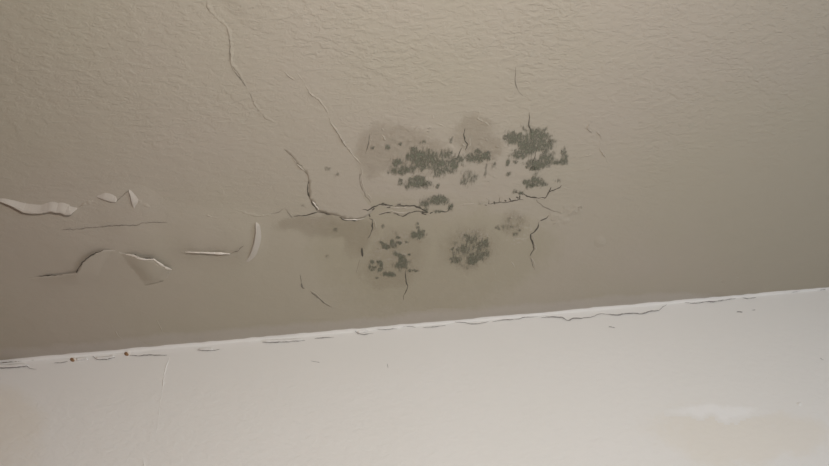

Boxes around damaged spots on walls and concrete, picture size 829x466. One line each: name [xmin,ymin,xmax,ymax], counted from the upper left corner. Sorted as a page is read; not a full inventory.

crack [206,0,277,124]
crack [271,67,589,272]
leakage [300,141,570,319]
leakage [504,127,567,195]
crack [0,361,32,369]
crack [355,297,756,335]